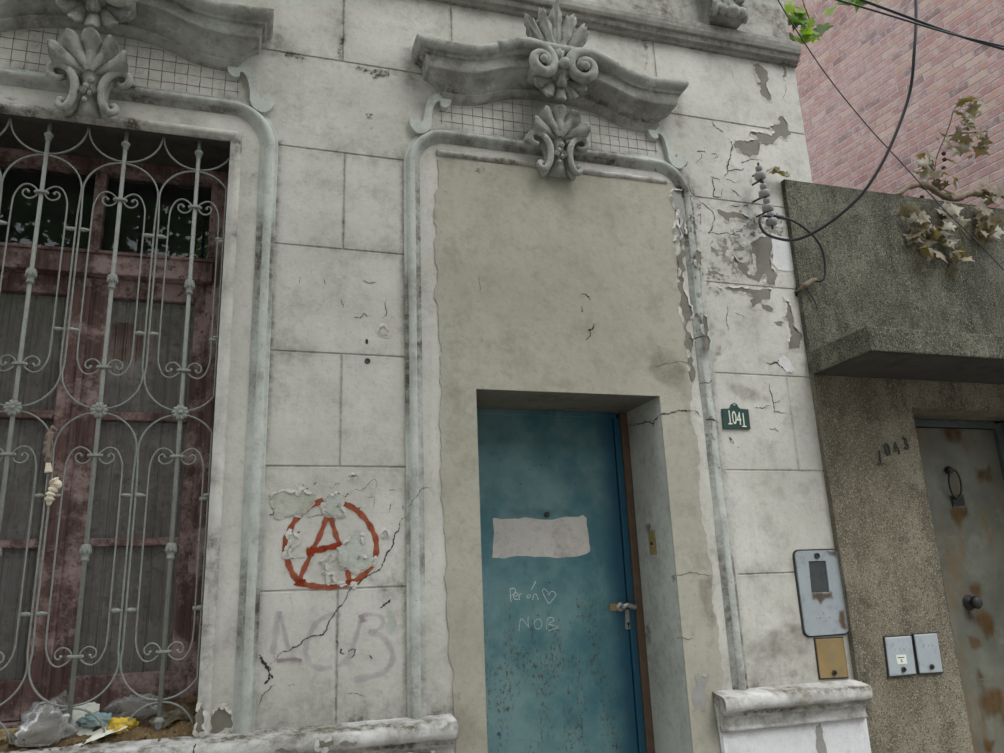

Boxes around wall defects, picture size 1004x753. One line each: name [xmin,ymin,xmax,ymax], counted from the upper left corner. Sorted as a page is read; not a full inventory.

peeling [751,63,774,104]
peeling [733,116,791,159]
crack [684,121,761,235]
peeling [669,188,804,381]
crack [756,360,786,430]
crack [630,410,718,426]
peeling [320,490,347,519]
peeling [318,531,378,589]
crack [258,481,432,707]
rust [970,613,994,648]
peeling [192,702,234,737]
peeling [314,735,358,753]